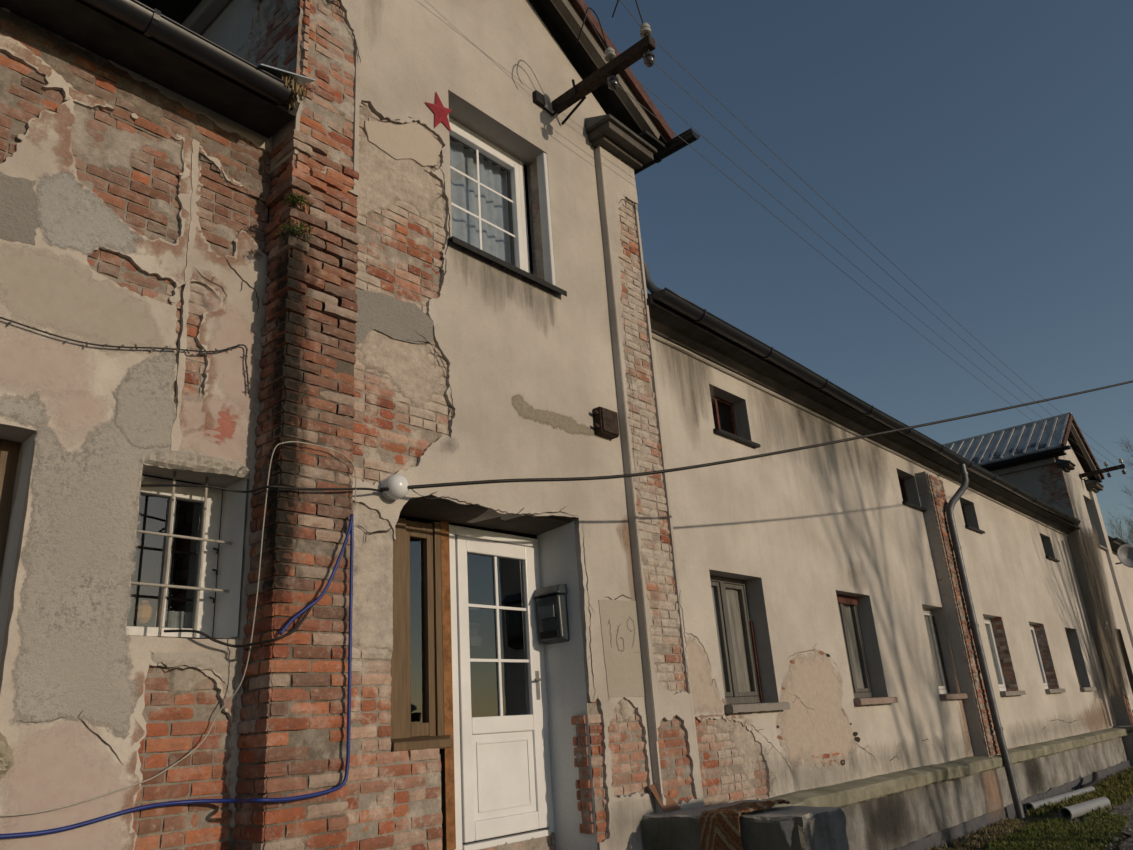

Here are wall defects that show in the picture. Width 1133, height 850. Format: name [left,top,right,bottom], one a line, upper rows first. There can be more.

flaking render [0,8,271,256]
crack [195,255,259,311]
flaking render [289,0,453,485]
flaking render [587,193,768,842]
flaking render [1038,463,1074,512]
flaking render [0,647,241,850]
peeling [777,650,860,768]